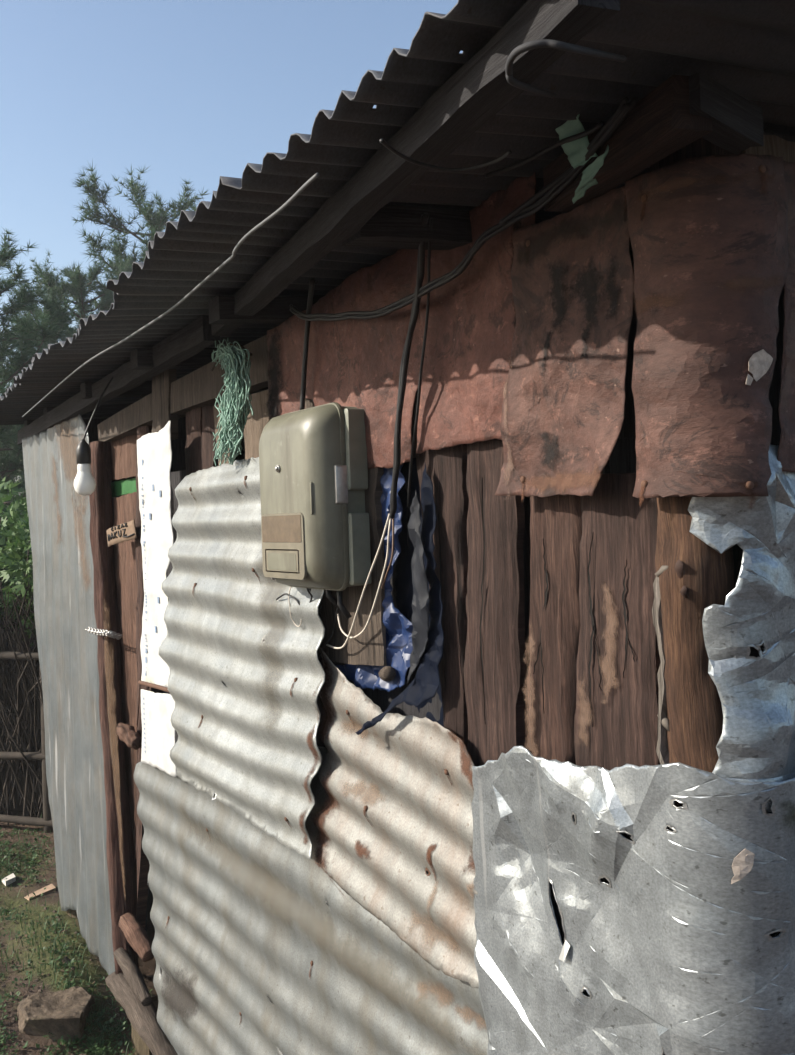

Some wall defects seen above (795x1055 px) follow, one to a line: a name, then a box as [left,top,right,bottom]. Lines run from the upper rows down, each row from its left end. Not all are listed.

peeling [601,586,617,702]
peeling [524,637,537,755]
peeling [577,688,590,744]
rust [286,657,339,873]
rust [355,841,369,858]
peeling [731,849,755,884]
peeling [559,940,570,962]